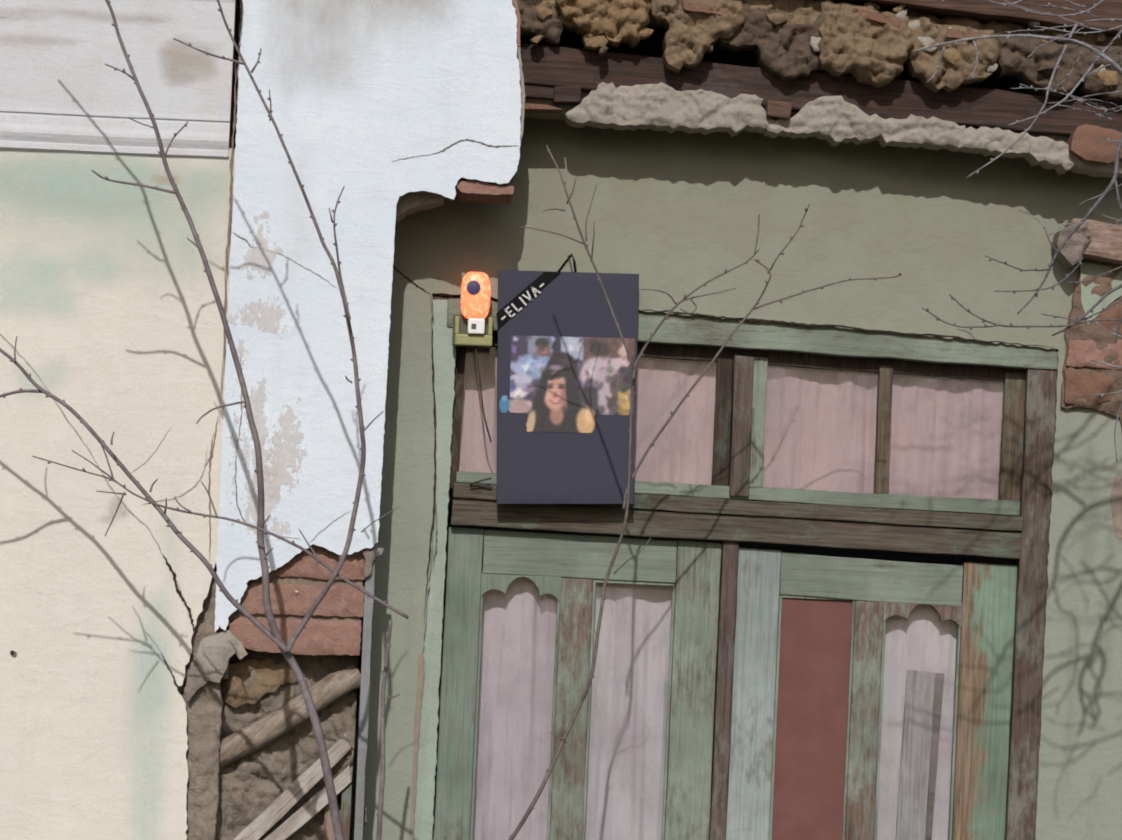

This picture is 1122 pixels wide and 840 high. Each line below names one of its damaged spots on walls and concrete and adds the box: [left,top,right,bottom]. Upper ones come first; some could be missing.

crack [396,139,519,161]
flaking render [564,82,1122,178]
peeling [242,210,283,279]
crack [0,0,335,631]
peeling [226,297,302,333]
spalling [1051,218,1122,429]
peeling [229,370,307,541]
crack [145,631,185,688]
flaking render [182,544,384,840]